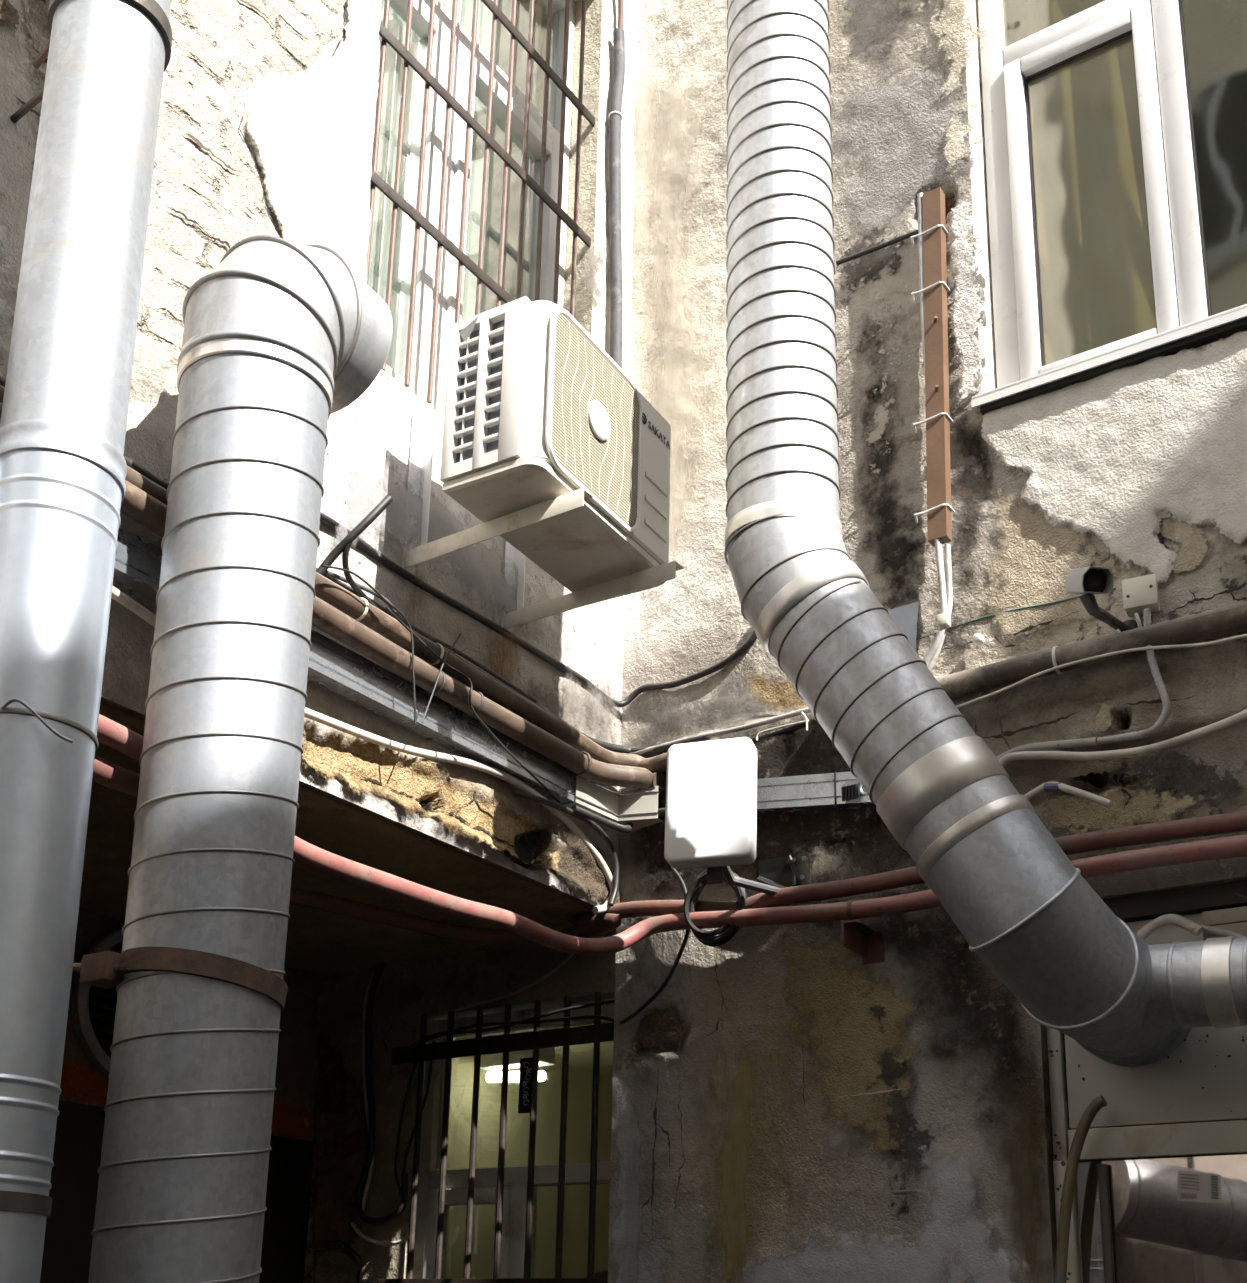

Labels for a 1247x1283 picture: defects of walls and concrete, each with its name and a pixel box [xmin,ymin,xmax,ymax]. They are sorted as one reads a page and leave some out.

flaking render [131,0,343,401]
water stain [836,226,917,308]
peeling [834,0,993,399]
water stain [858,320,928,608]
water stain [946,607,971,654]
water stain [951,407,992,591]
peeling [987,490,1119,638]
spalling [301,718,621,904]
spalling [633,934,686,1055]
crack [641,1068,686,1234]
peeling [779,934,921,1152]
water stain [867,1048,935,1217]